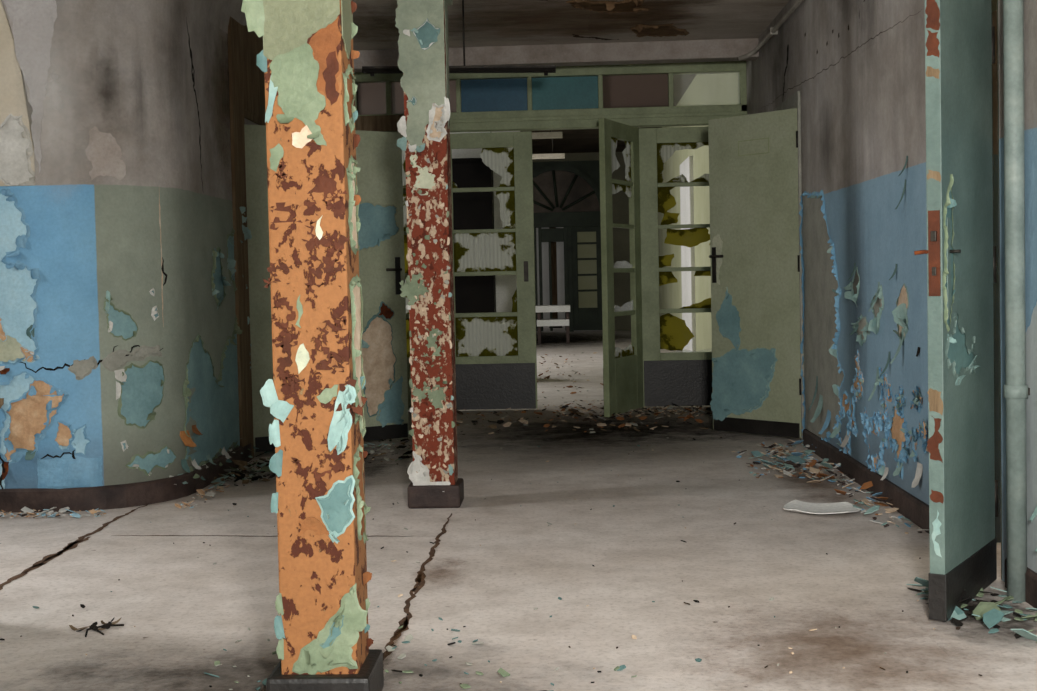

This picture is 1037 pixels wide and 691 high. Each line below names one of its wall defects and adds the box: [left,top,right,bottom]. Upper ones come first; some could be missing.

peeling [0,0,91,480]
peeling [68,290,165,429]
peeling [120,0,455,544]
peeling [799,190,943,488]
peeling [1026,300,1037,573]
crack [0,504,234,590]
peeling [274,572,374,675]
crack [383,513,452,671]
peeling [930,490,944,557]